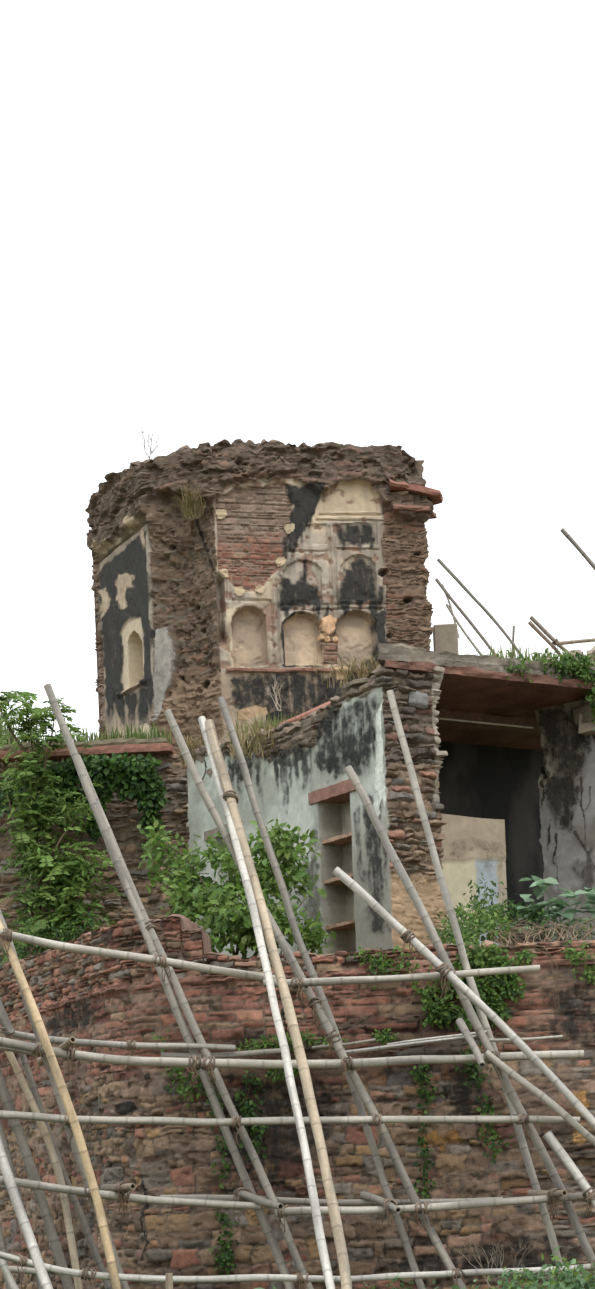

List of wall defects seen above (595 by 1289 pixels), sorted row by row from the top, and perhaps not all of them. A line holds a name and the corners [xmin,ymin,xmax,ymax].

peeling [98,573,135,619]
spalling [122,480,295,777]
water stain [225,482,386,803]
water stain [537,705,595,832]
water stain [354,796,390,932]